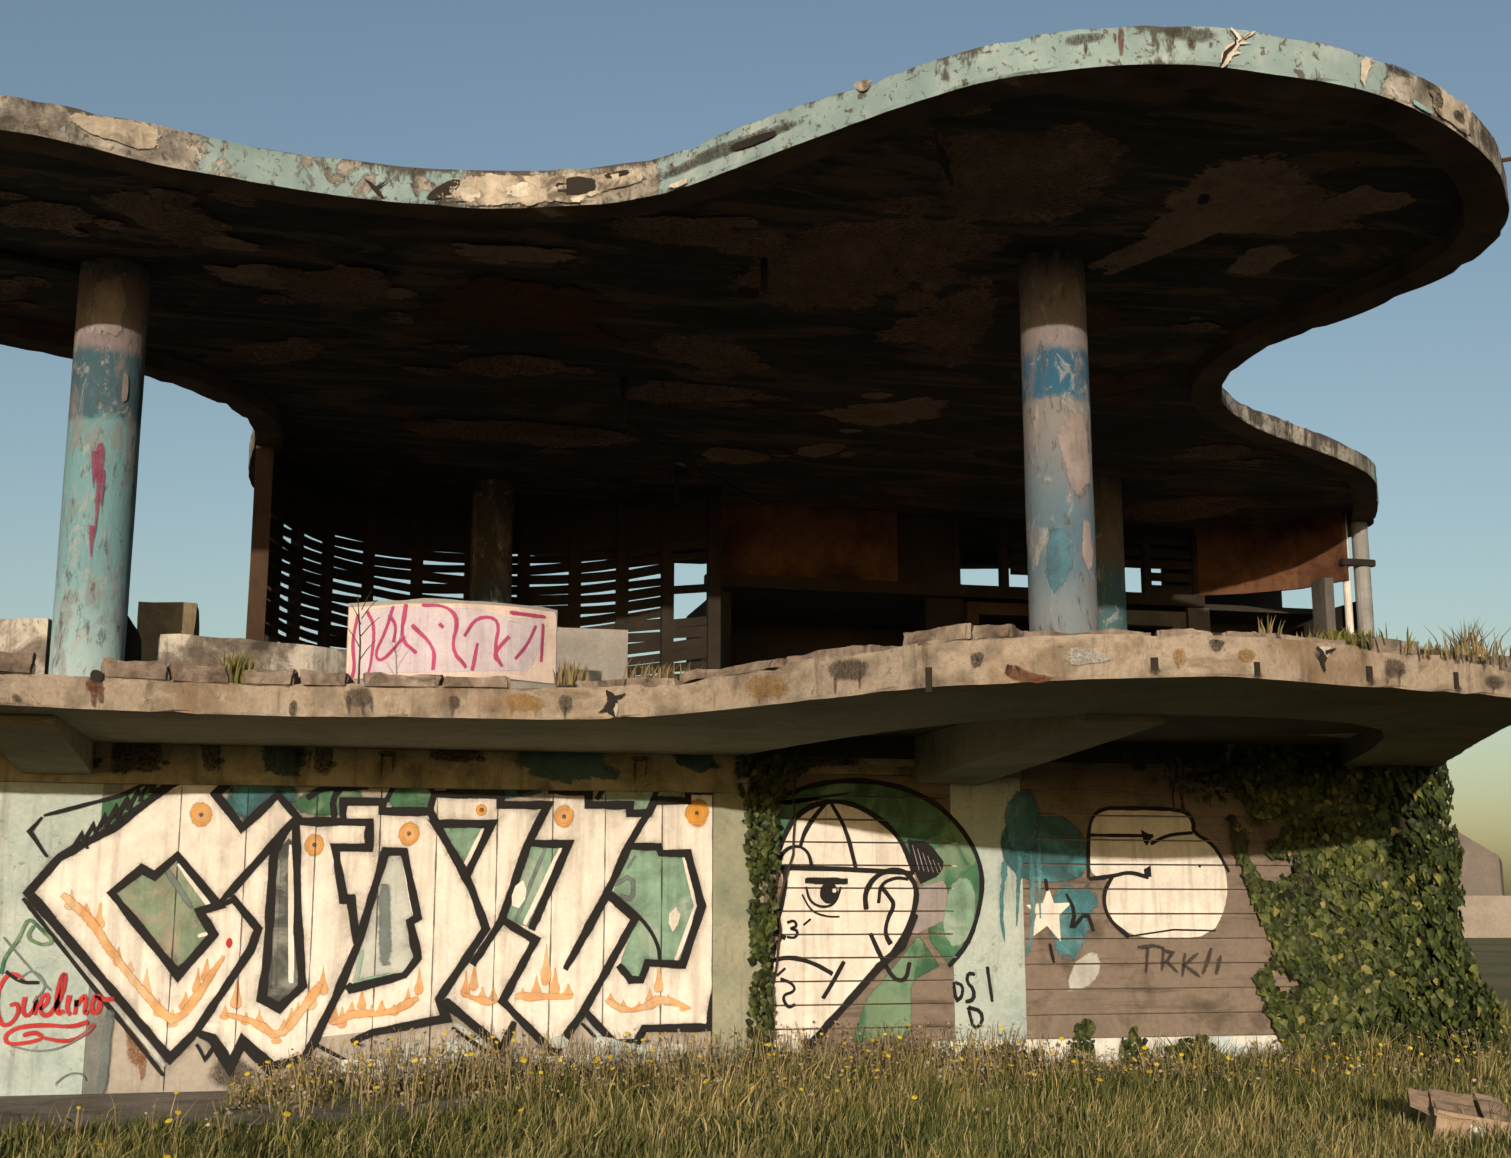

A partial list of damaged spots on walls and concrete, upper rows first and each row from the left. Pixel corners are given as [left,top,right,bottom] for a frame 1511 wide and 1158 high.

peeling [1361,57,1374,86]
peeling [1413,86,1497,154]
spalling [425,120,800,206]
peeling [0,188,418,300]
peeling [451,243,578,264]
peeling [608,212,760,247]
peeling [1086,150,1418,278]
peeling [93,274,126,336]
peeling [1057,352,1177,498]
peeling [1047,519,1093,592]
spalling [971,652,984,667]
spalling [1004,664,1053,683]